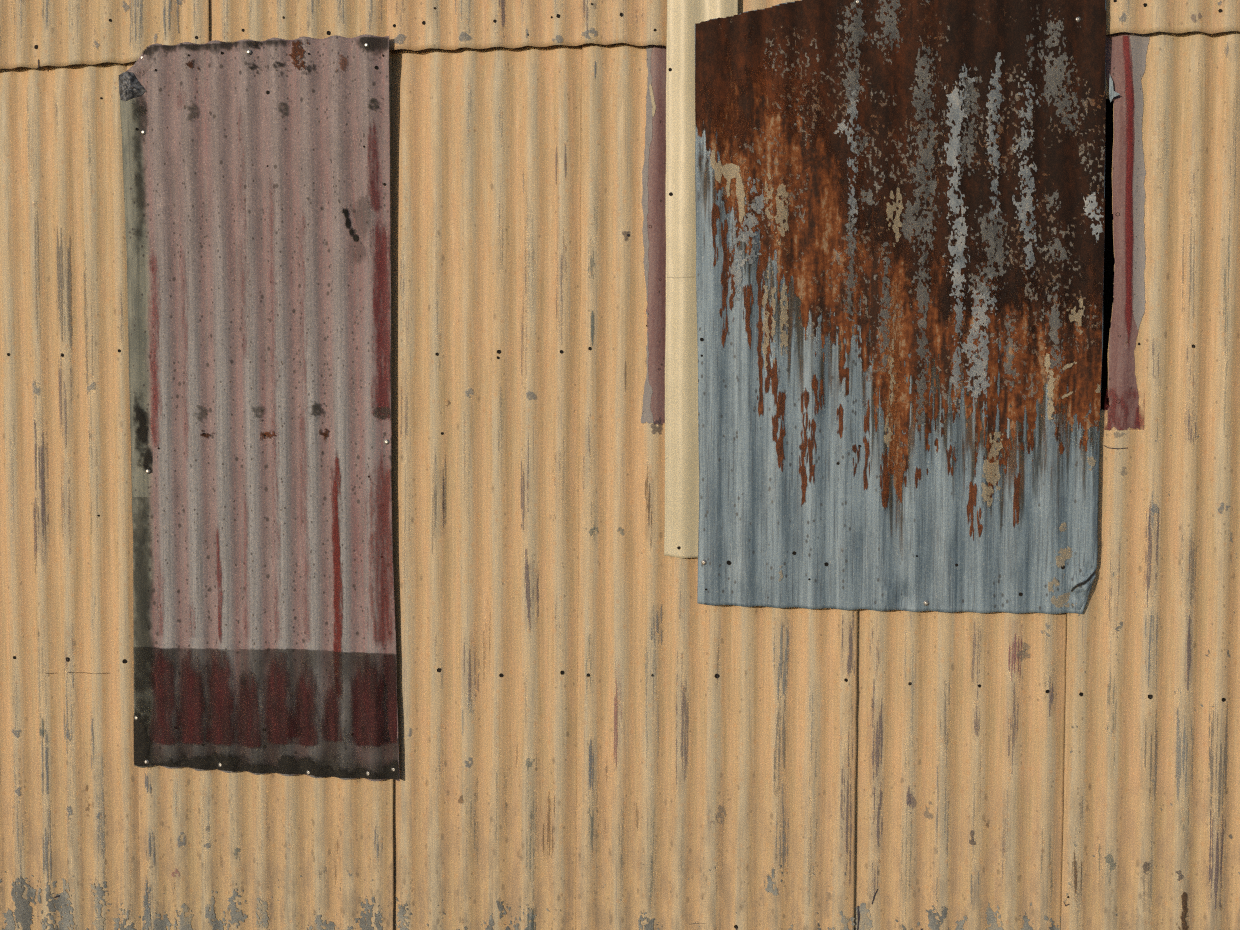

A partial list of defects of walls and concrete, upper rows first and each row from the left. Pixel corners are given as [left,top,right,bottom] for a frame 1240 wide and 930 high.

corrosion [695,0,1106,541]
peeling [872,683,882,845]
peeling [0,720,279,930]
peeling [840,733,853,886]
peeling [301,879,412,930]
peeling [638,912,662,930]
peeling [764,865,783,896]
peeling [817,903,873,930]
peeling [895,901,967,930]
peeling [985,903,1003,930]
peeling [1019,842,1099,930]